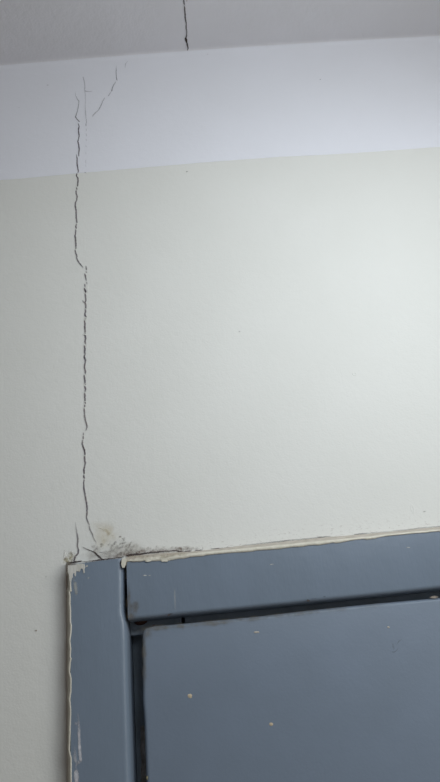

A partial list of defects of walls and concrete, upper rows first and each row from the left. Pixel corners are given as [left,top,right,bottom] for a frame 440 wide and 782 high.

crack [182,0,190,50]
crack [74,116,103,561]